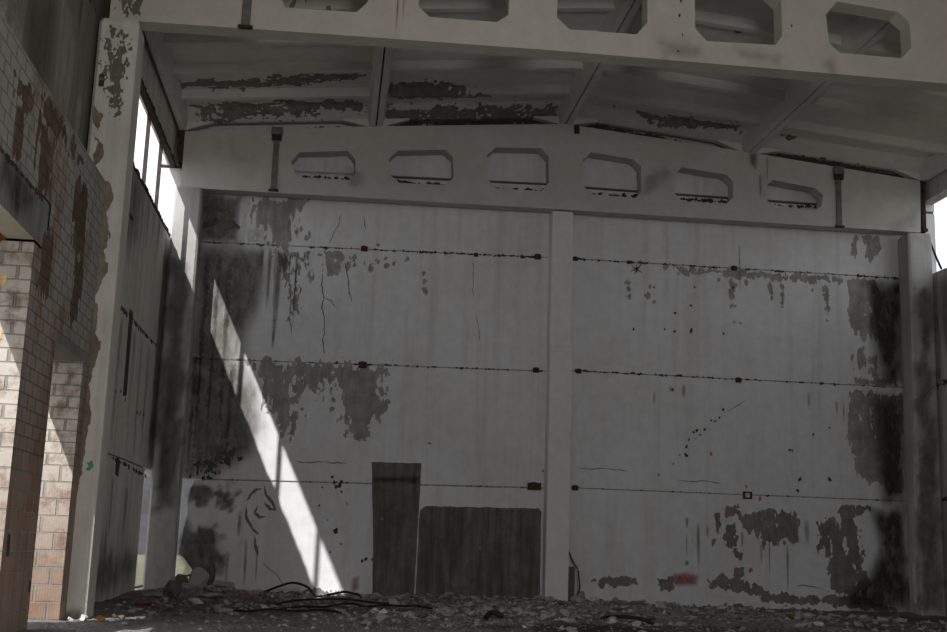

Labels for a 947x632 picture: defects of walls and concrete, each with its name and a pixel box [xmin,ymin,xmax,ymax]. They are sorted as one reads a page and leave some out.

peeling [179,73,370,128]
peeling [376,79,558,126]
flaking render [12,69,104,329]
peeling [851,234,882,263]
peeling [77,181,114,492]
peeling [195,356,436,444]
peeling [661,260,905,493]
water stain [871,281,901,383]
water stain [850,363,945,610]
peeling [591,576,639,602]
peeling [657,576,675,593]
peeling [685,498,898,612]